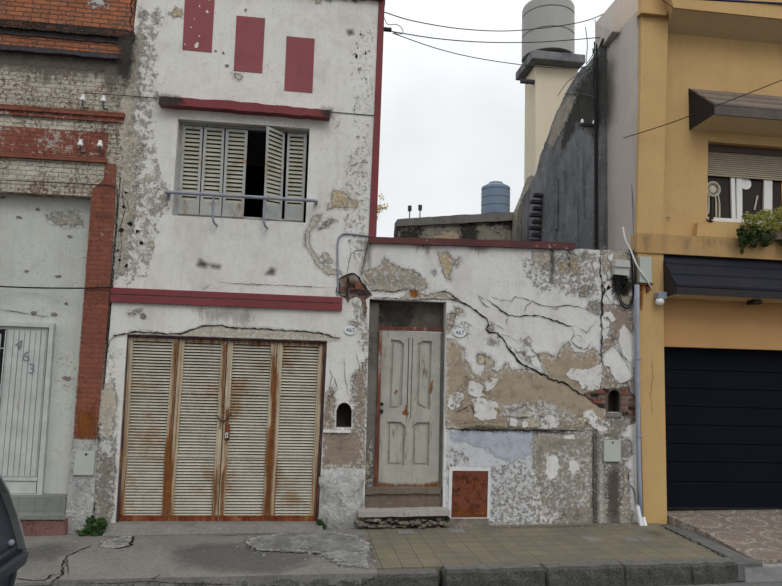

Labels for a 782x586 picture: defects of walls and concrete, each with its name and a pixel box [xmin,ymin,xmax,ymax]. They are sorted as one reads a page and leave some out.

peeling [112,7,184,285]
peeling [92,325,339,523]
corrosion [163,339,277,515]
corrosion [451,508,486,516]
peeling [304,22,636,525]
crack [370,255,629,408]